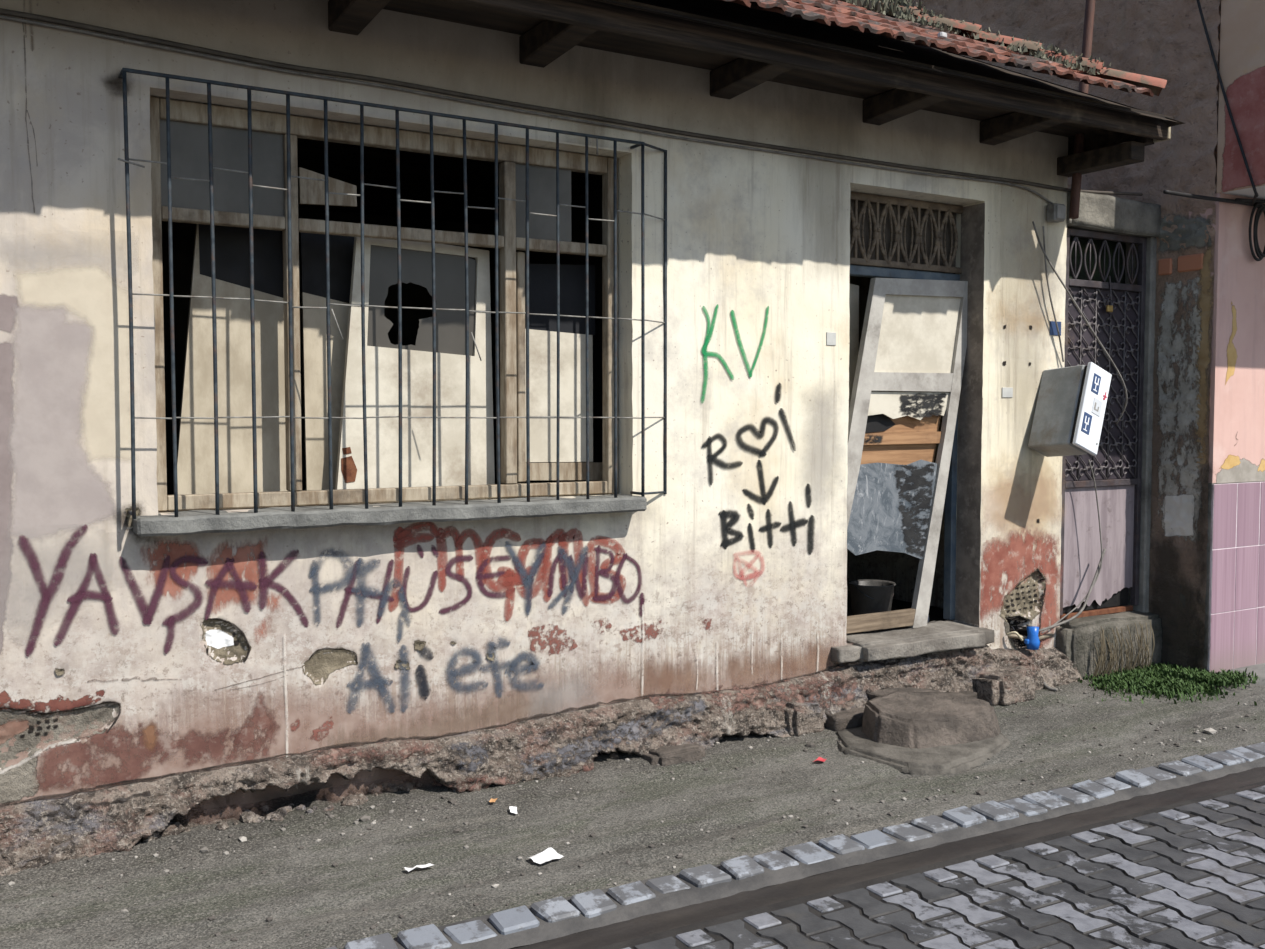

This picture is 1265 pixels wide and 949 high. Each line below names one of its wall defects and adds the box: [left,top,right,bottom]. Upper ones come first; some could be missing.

peeling [1156,253,1204,541]
peeling [1225,302,1238,385]
peeling [1216,455,1265,483]
peeling [147,541,279,665]
peeling [980,531,1061,651]
flaking render [302,647,358,686]
flaking render [0,678,857,803]